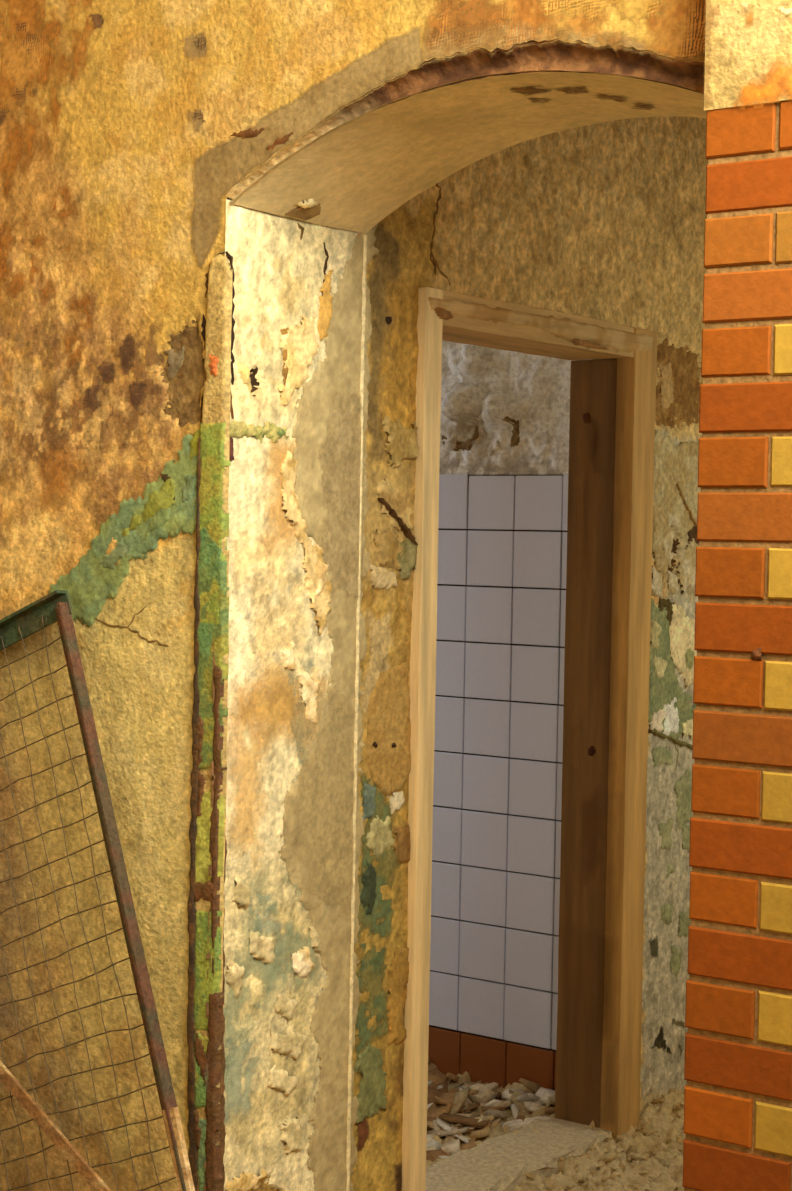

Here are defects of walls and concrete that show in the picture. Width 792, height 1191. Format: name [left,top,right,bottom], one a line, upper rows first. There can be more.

crack [430,183,451,286]
leakage [20,329,165,463]
peeling [47,317,207,627]
crack [96,606,169,647]
peeling [282,642,321,727]
peeling [279,270,333,406]
peeling [281,450,332,635]
peeling [369,416,419,590]
peeling [648,338,703,851]
corrosion [187,437,227,1191]
peeling [291,926,322,979]
peeling [354,775,411,1123]